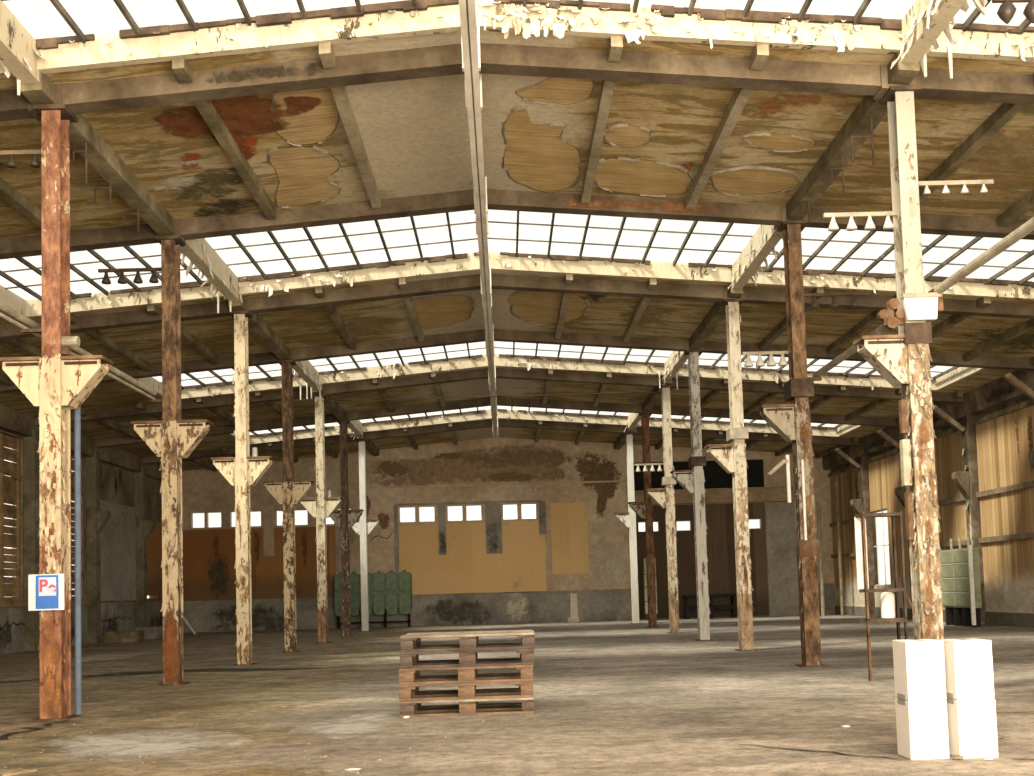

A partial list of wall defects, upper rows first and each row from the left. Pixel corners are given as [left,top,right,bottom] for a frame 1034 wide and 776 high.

peeling [478,0,610,39]
peeling [617,5,664,44]
rust [154,107,221,146]
rust [181,153,201,170]
rust [211,96,321,160]
flaking render [267,88,343,208]
flaking render [501,77,596,193]
flaking render [594,157,694,197]
flaking render [413,294,475,330]
peeling [232,324,248,417]
peeling [904,343,942,585]
rust [163,566,178,684]